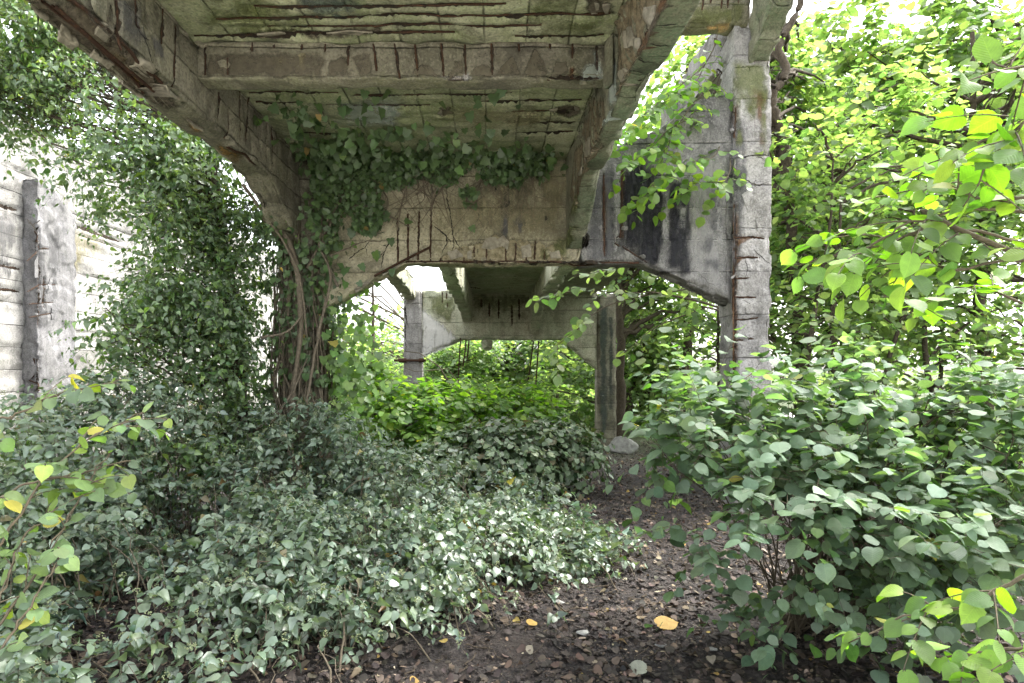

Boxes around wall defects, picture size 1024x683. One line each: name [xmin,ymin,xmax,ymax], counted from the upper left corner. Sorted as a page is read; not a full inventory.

spalling [18,0,180,108]
peeling [194,0,672,210]
damp [592,115,747,293]
rust [732,213,750,370]